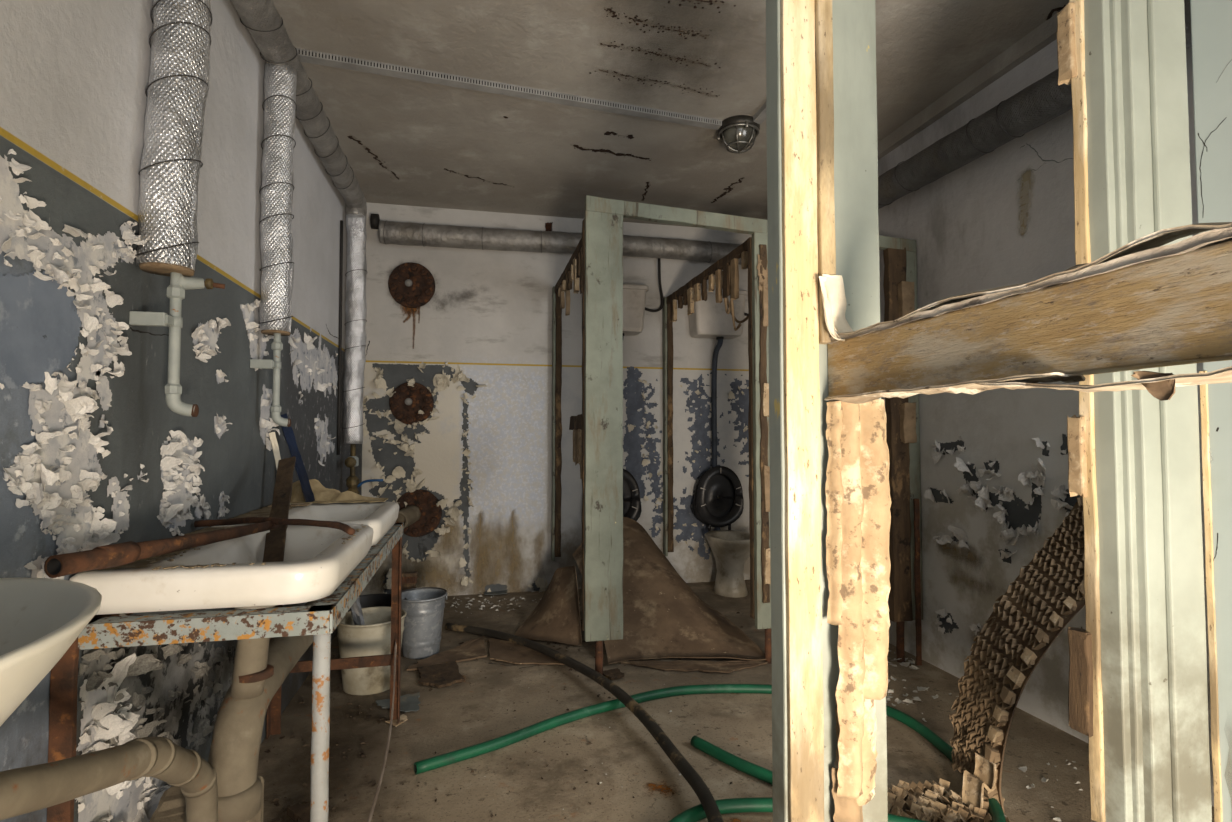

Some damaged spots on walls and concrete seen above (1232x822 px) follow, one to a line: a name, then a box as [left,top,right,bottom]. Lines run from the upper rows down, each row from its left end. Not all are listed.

crack [589,0,736,96]
crack [573,131,651,201]
peeling [0,149,232,580]
peeling [191,299,338,404]
corrosion [401,305,420,349]
peeling [314,413,335,466]
peeling [363,361,548,614]
peeling [623,367,749,560]
peeling [924,434,1080,564]
leakage [402,511,520,593]
peeling [76,642,236,755]
peeling [75,777,171,822]